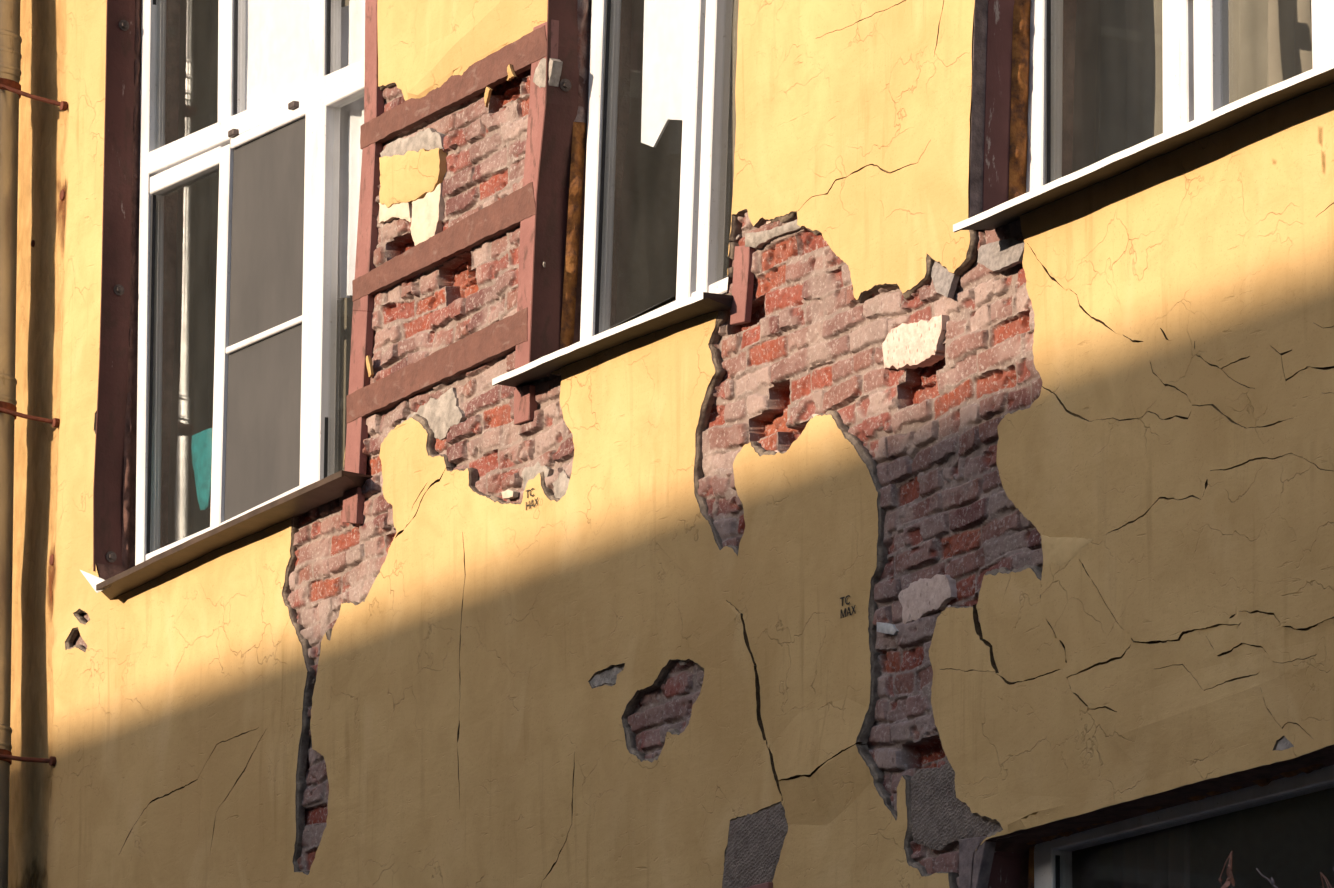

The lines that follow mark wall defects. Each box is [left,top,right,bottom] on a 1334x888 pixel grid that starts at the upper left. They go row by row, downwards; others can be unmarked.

crack [818,0,906,38]
flaking render [373,58,563,267]
crack [798,140,931,211]
flaking render [366,226,520,384]
crack [1027,243,1334,533]
flaking render [65,608,91,652]
flaking render [282,351,574,875]
flaking render [588,663,625,689]
flaking render [621,659,704,763]
crack [726,600,863,801]
flaking render [694,209,1093,888]
crack [941,561,1334,735]